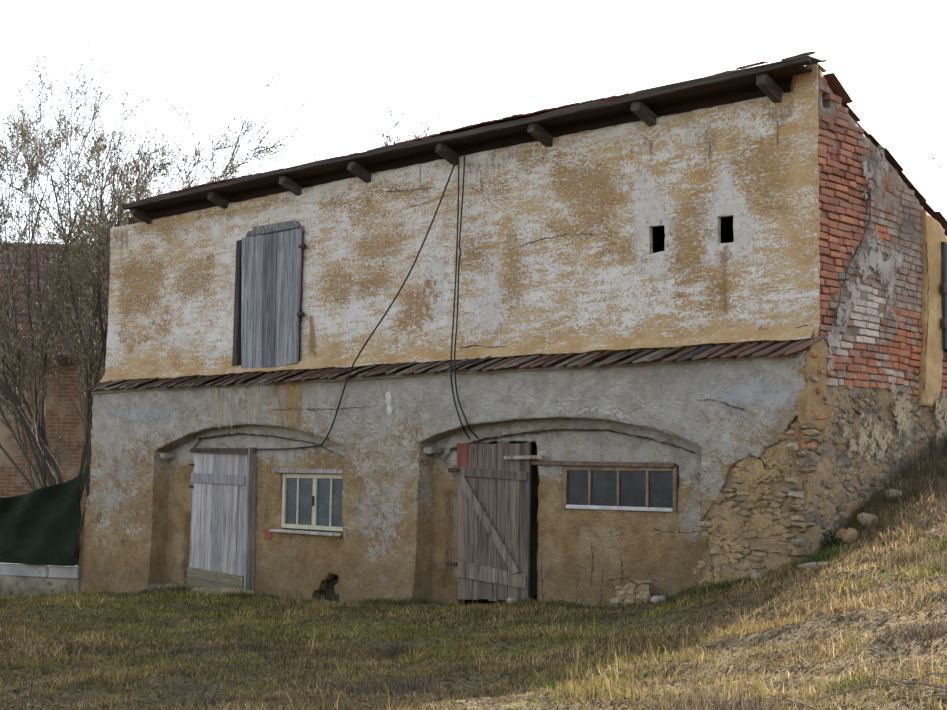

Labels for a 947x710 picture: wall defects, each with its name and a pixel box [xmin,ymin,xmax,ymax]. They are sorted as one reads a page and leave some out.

peeling [113,198,289,352]
peeling [319,181,529,348]
peeling [468,135,793,318]
crack [833,183,872,326]
flaking render [818,76,924,396]
flaking render [701,372,795,410]
spalling [692,417,821,589]
spalling [319,575,340,603]